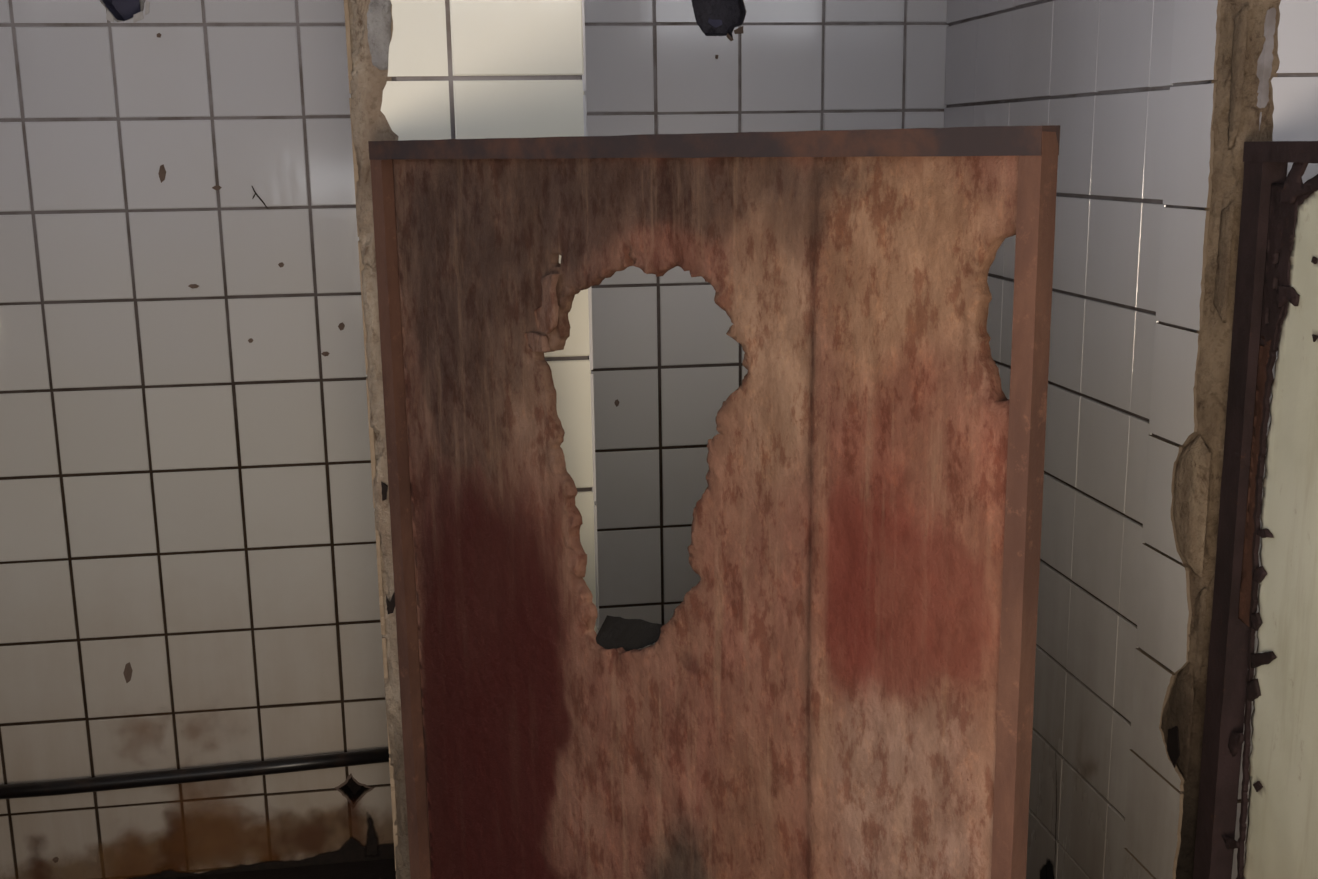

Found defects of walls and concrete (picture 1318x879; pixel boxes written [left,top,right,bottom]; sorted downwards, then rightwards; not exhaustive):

spalling [100,0,150,23]
hole [691,0,746,41]
corrosion [534,274,559,334]
spalling [348,0,411,879]
spalling [1161,0,1280,879]
leakage [127,816,395,879]